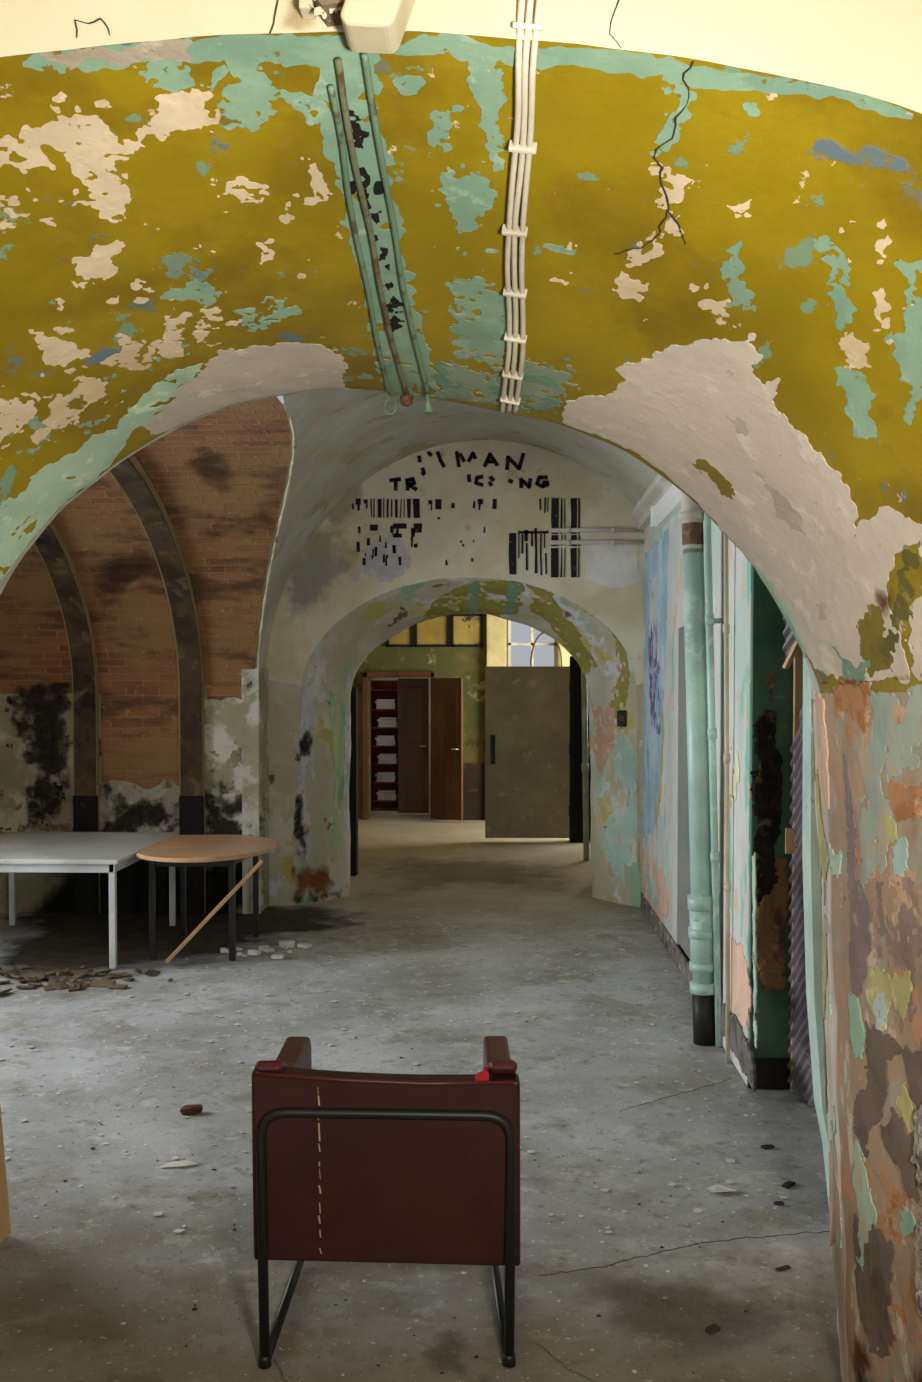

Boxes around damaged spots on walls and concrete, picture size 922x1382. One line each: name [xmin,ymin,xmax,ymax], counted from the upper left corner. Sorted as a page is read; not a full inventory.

peeling [0,0,348,227]
peeling [350,167,404,314]
peeling [426,48,508,256]
crack [614,61,694,254]
peeling [612,65,697,302]
peeling [689,241,756,317]
peeling [813,218,922,440]
leakage [10,682,71,827]
leakage [100,783,179,832]
flaking render [204,684,242,833]
leakage [205,782,242,835]
flaking render [412,270,922,1359]